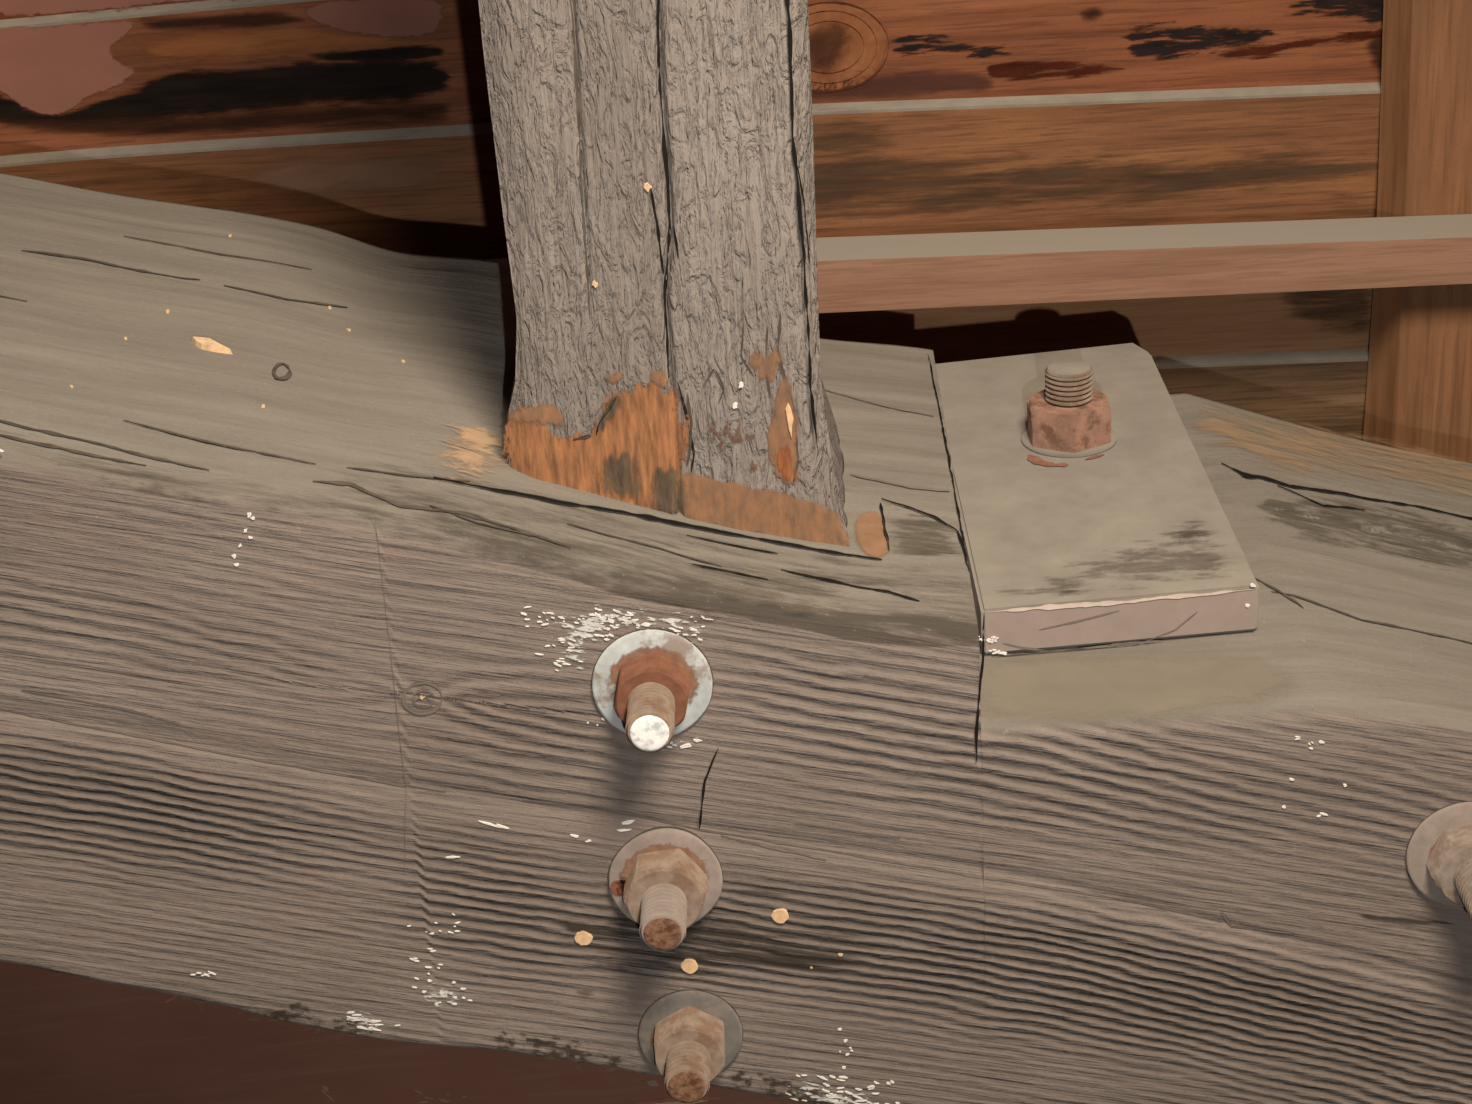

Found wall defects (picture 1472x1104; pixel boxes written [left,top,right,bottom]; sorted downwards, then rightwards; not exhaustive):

leakage [149,13,297,28]
leakage [0,46,450,134]
leakage [811,34,1121,97]
leakage [1124,0,1384,67]
peeling [501,350,887,557]
rust [608,646,698,703]
rust [610,844,708,896]
crack [526,748,1295,933]